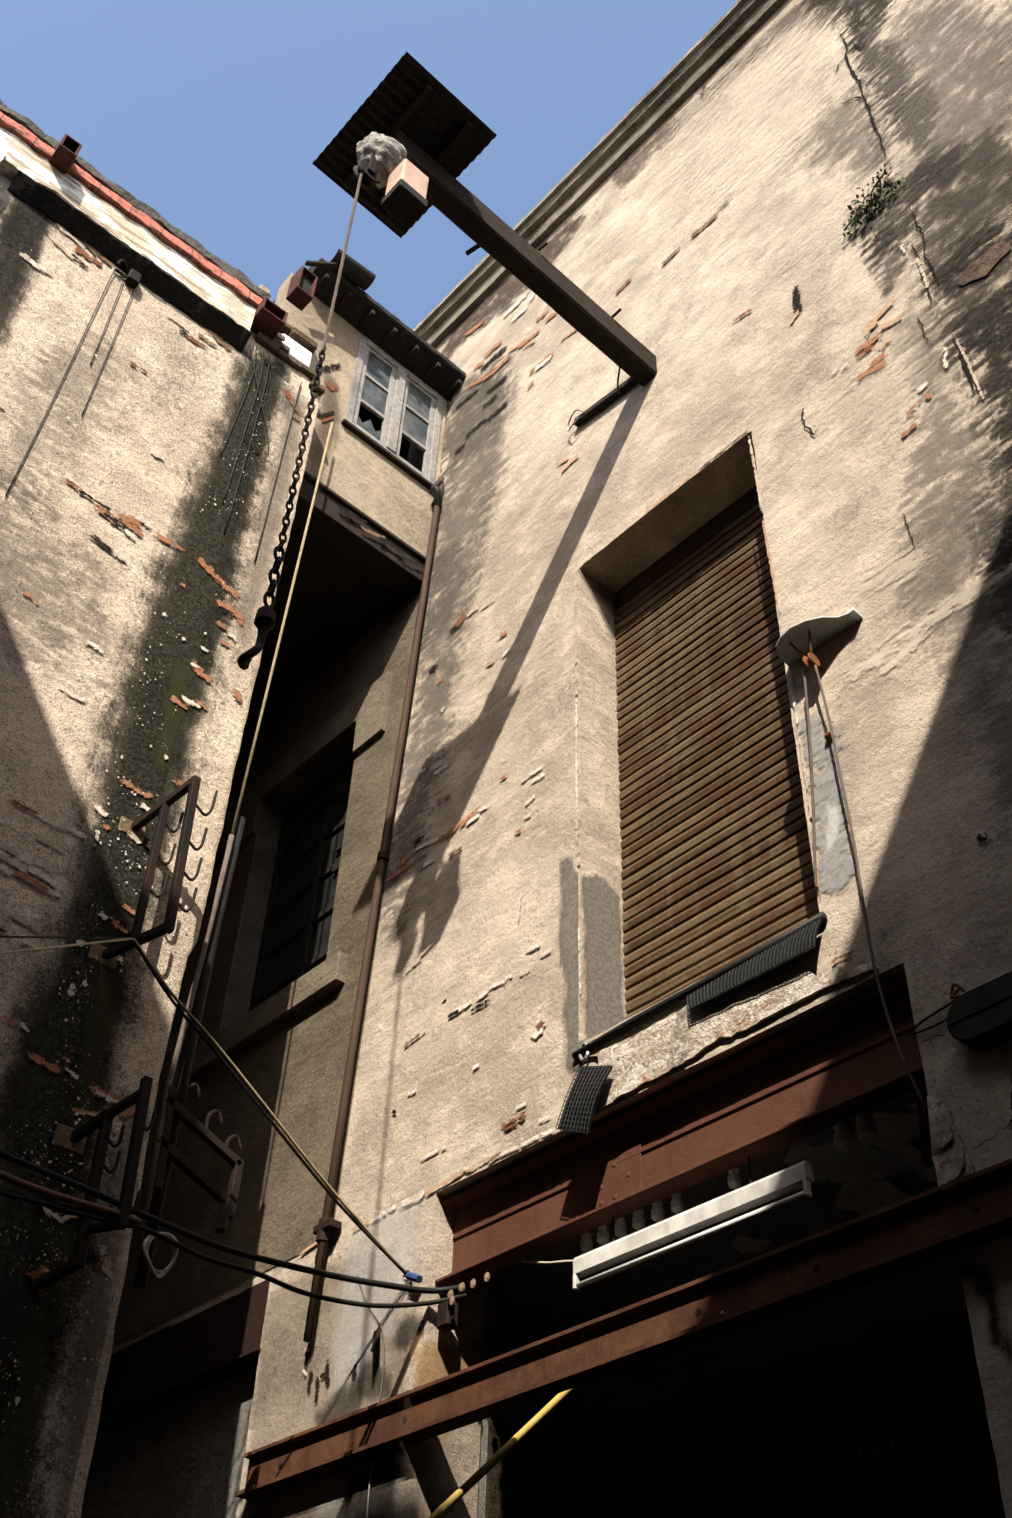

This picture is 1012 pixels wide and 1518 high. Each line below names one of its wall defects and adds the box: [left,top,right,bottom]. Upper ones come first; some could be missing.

crack [835,33,887,157]
leakage [0,195,56,347]
leakage [437,275,527,359]
spalling [455,290,556,455]
leakage [536,214,586,263]
leakage [613,0,1012,687]
spalling [66,478,246,682]
spalling [170,695,207,709]
spalling [119,779,153,811]
leakage [0,350,291,1518]
peeling [590,950,879,1109]
corrosion [416,1342,493,1383]